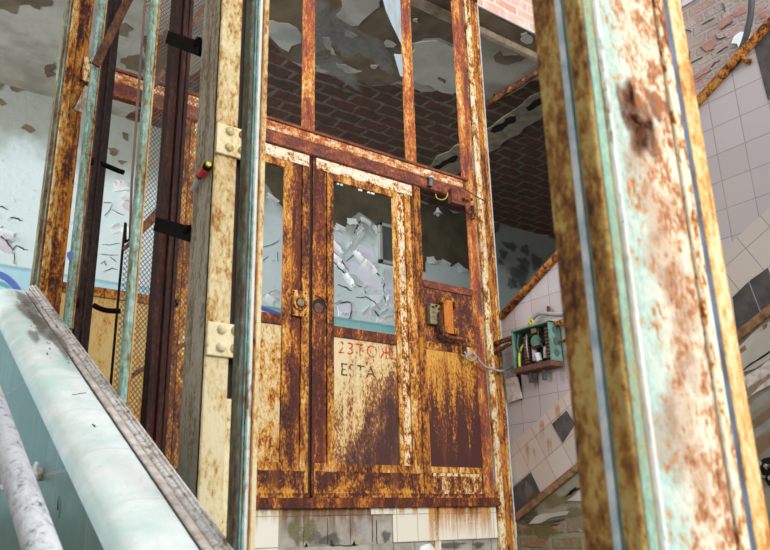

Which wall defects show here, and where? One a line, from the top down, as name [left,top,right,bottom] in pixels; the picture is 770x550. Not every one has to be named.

flaking render [0,0,53,14]
peeling [265,164,284,208]
flaking render [266,0,303,126]
flaking render [315,0,405,159]
flaking render [410,5,461,177]
flaking render [427,0,451,12]
flaking render [473,0,537,65]
flaking render [485,80,555,239]
corrosion [617,76,663,161]
peeling [420,189,469,274]
corrosion [256,508,373,520]
corrosion [429,506,491,529]